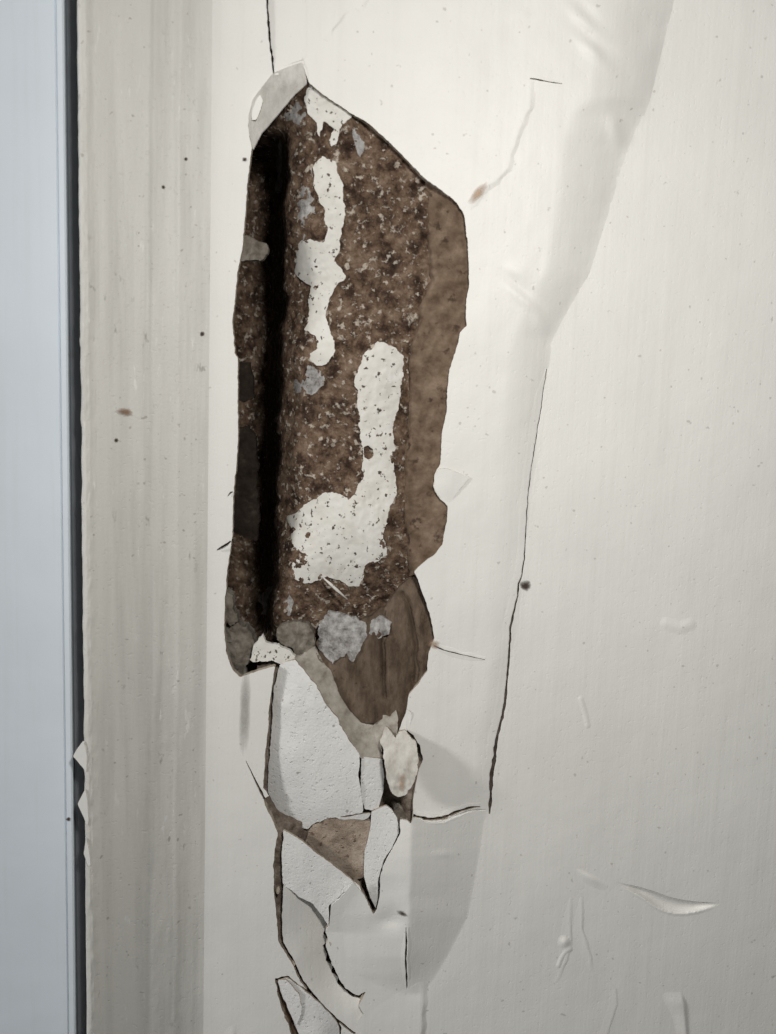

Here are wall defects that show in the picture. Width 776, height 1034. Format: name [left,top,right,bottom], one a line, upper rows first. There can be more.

crack [215,0,279,76]
spalling [217,63,469,1034]
crack [413,369,552,825]
crack [355,927,428,1034]